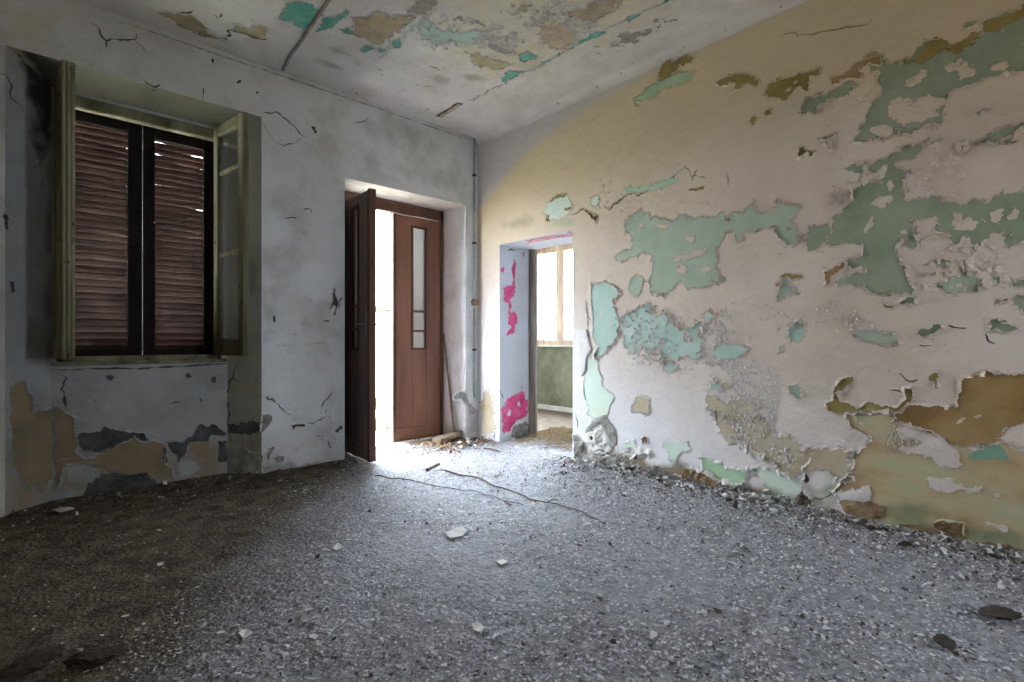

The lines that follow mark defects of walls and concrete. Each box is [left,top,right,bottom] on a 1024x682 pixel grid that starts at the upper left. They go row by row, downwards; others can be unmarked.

crack [0,73,23,112]
crack [91,11,466,139]
crack [261,111,306,146]
peeling [156,0,679,82]
flaking render [434,101,464,118]
flaking render [500,0,1024,567]
flaking render [4,379,286,496]
crack [266,392,333,424]